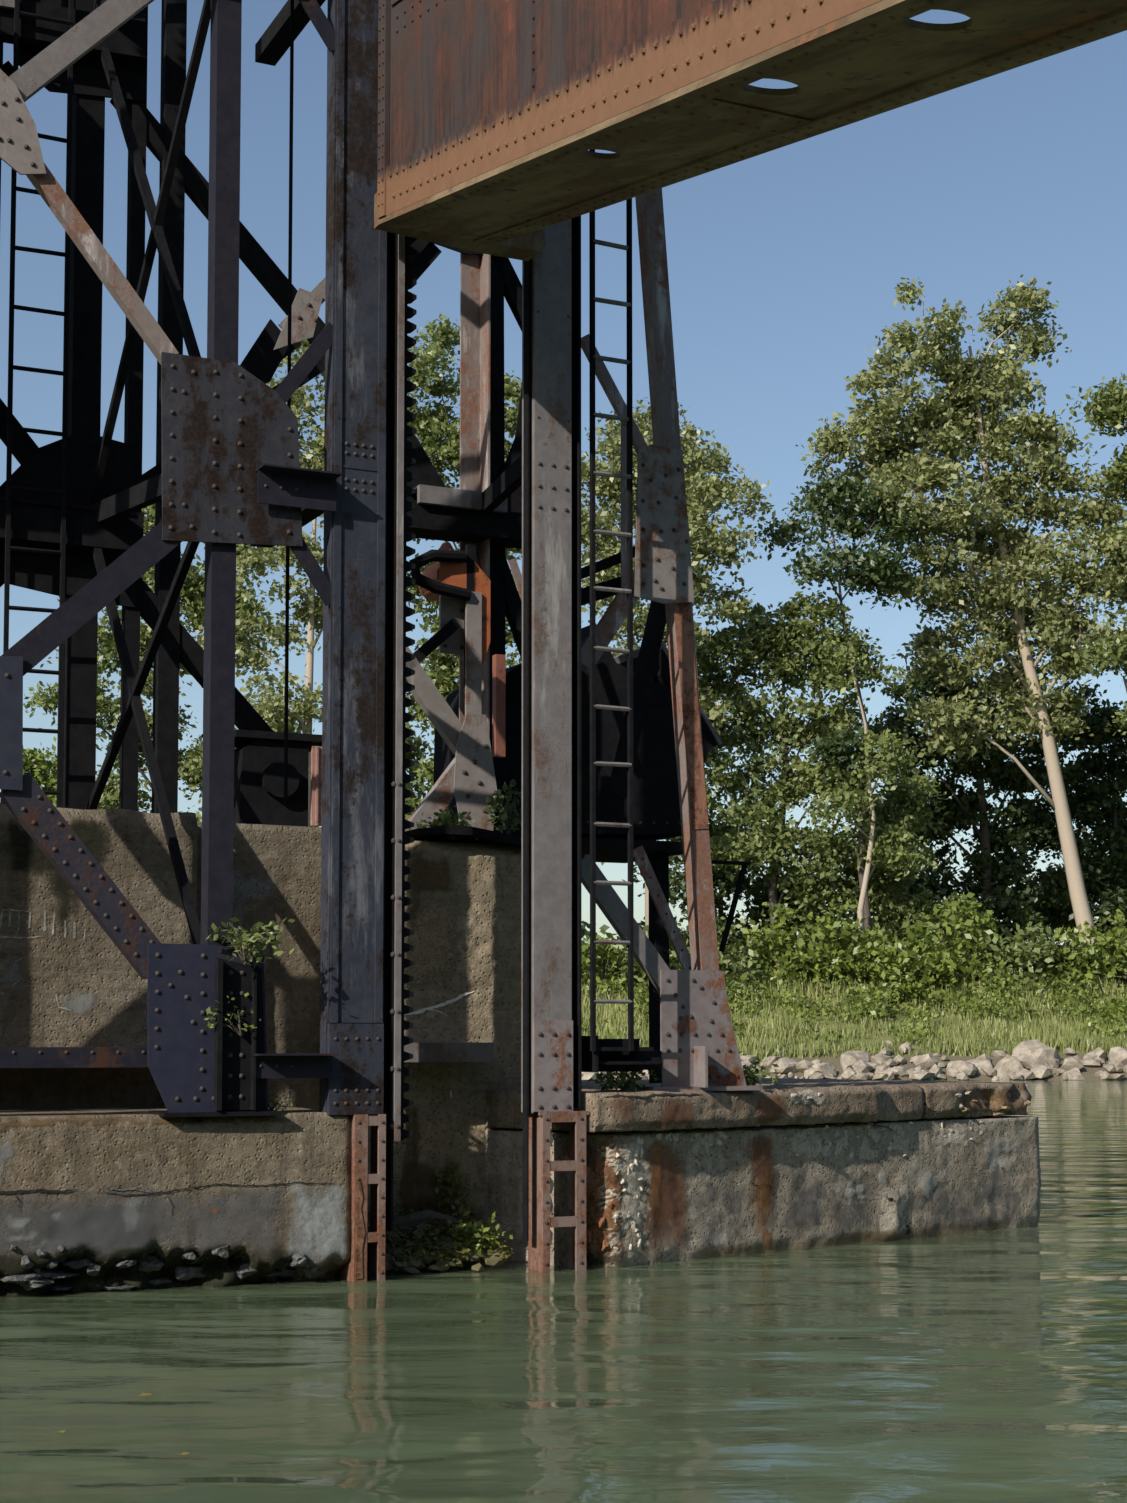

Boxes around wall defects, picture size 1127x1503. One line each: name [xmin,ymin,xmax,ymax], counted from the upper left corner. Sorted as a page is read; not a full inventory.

corrosion [708,1065,742,1086]
crack [0,1182,343,1218]
corrosion [645,1101,691,1246]
corrosion [753,1096,785,1249]